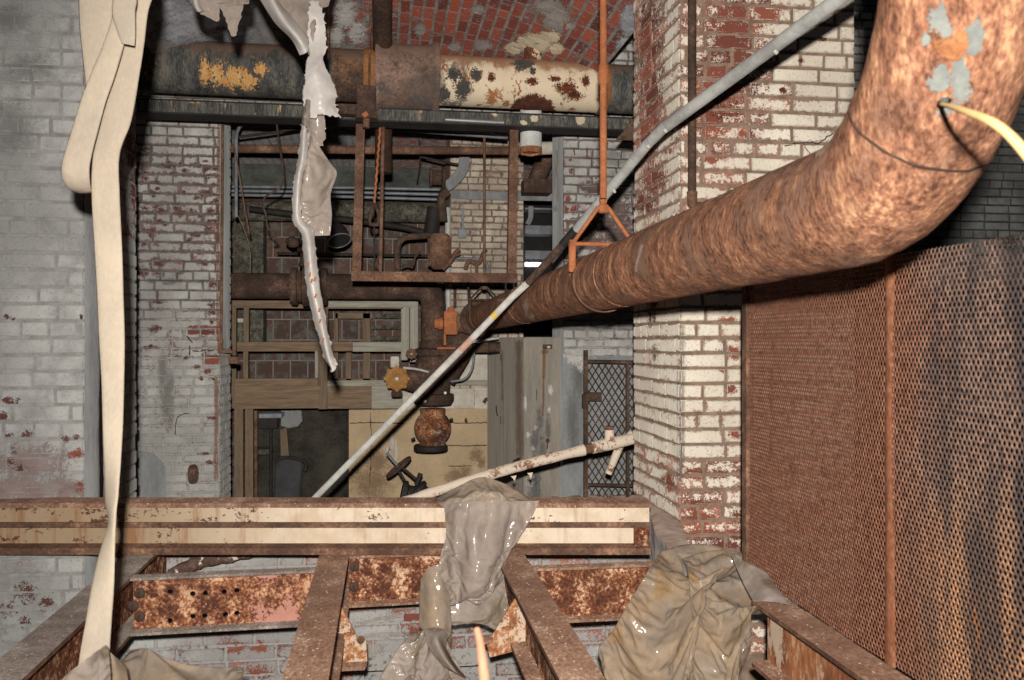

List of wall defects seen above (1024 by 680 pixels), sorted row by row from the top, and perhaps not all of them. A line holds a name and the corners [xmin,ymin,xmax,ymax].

peeling [680,0,784,166]
spalling [124,126,221,279]
peeling [188,302,220,335]
peeling [192,355,220,381]
peeling [0,396,84,499]
peeling [656,462,742,549]